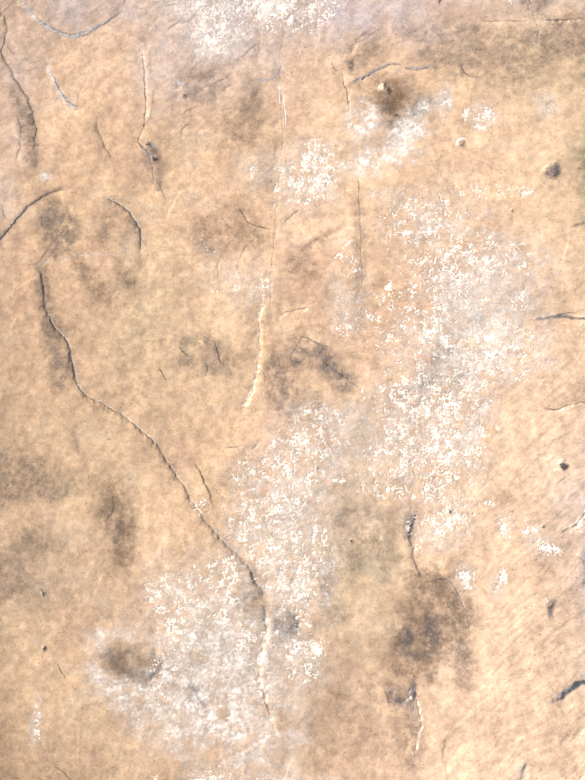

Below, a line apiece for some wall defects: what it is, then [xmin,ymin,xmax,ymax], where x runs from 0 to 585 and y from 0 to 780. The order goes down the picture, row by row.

leakage [461,107,499,131]
leakage [250,91,452,209]
crack [537,312,585,320]
leakage [90,182,552,780]
leakage [521,519,563,556]